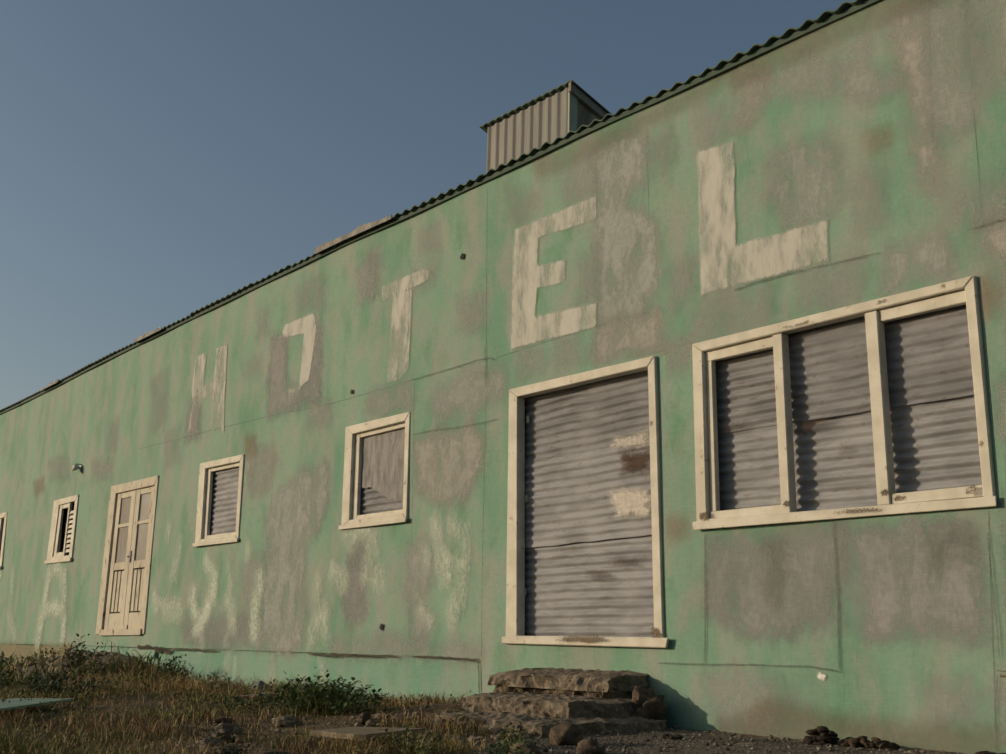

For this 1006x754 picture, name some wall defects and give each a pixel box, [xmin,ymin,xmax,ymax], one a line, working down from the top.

peeling [592,132,663,362]
peeling [414,420,483,506]
peeling [612,434,648,448]
peeling [612,489,651,517]
rust [621,450,650,472]
peeling [841,520,984,646]